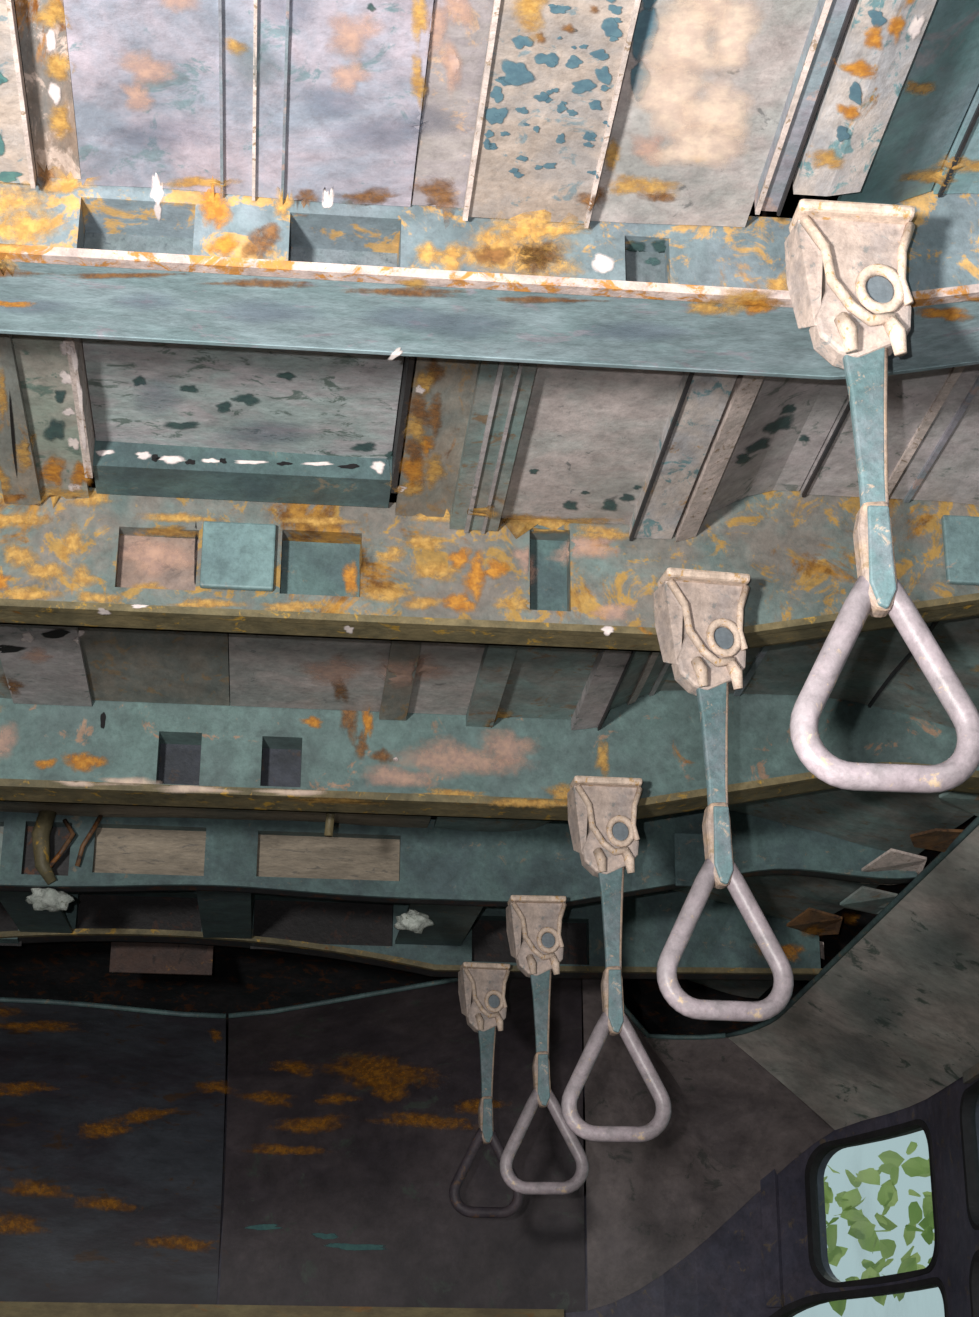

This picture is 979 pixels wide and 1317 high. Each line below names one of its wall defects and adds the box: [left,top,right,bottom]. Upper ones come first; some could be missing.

peeling [483,0,754,164]
peeling [0,135,22,182]
peeling [509,155,557,178]
rust [581,142,673,211]
rust [0,162,92,277]
rust [175,175,391,257]
rust [419,209,578,275]
rust [360,280,448,297]
rust [395,359,443,495]
rust [0,532,116,603]
rust [129,513,210,589]
rust [343,506,625,611]